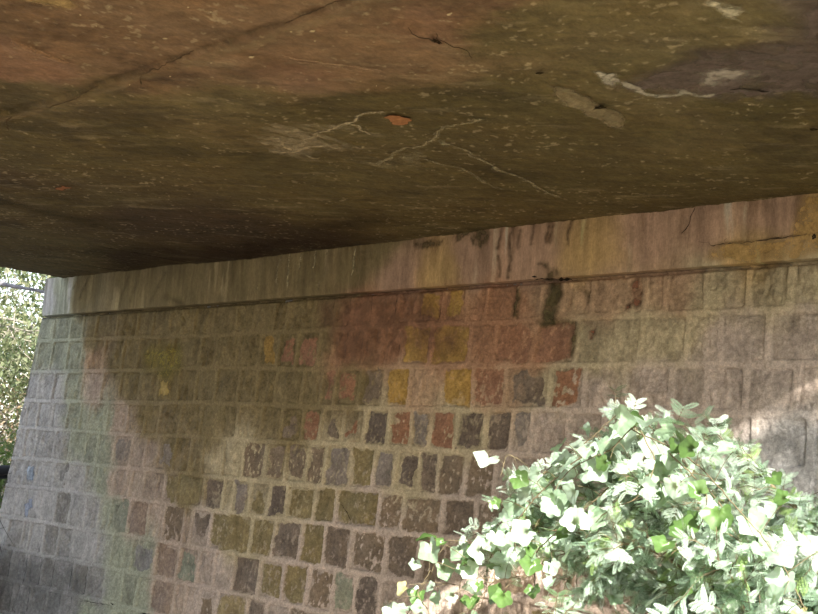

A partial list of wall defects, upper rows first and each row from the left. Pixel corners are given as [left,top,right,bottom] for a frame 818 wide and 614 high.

crack [286,1,340,23]
damp [707,1,741,16]
damp [596,7,818,98]
damp [712,196,818,262]
damp [540,263,562,326]